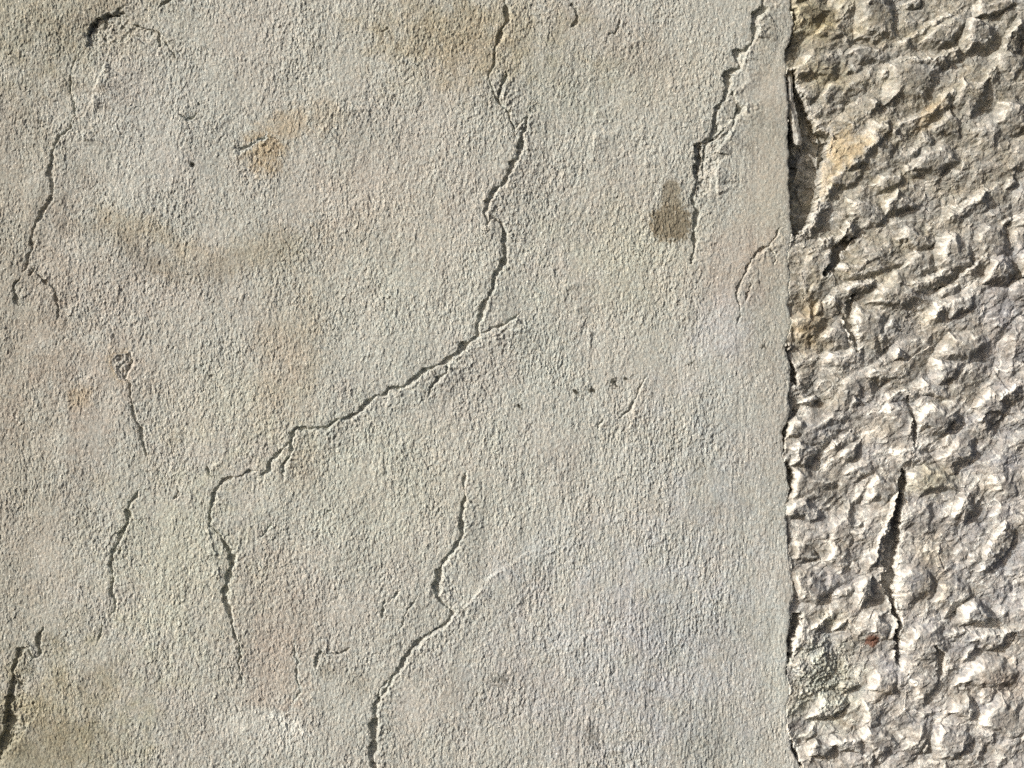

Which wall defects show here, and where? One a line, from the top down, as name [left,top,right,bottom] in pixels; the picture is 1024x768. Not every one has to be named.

crack [10,44,117,324]
crack [176,110,268,152]
crack [204,0,539,694]
leakage [642,177,692,249]
crack [689,0,776,268]
crack [0,622,48,768]
crack [96,349,151,672]
crack [366,465,521,768]
crack [878,394,924,671]